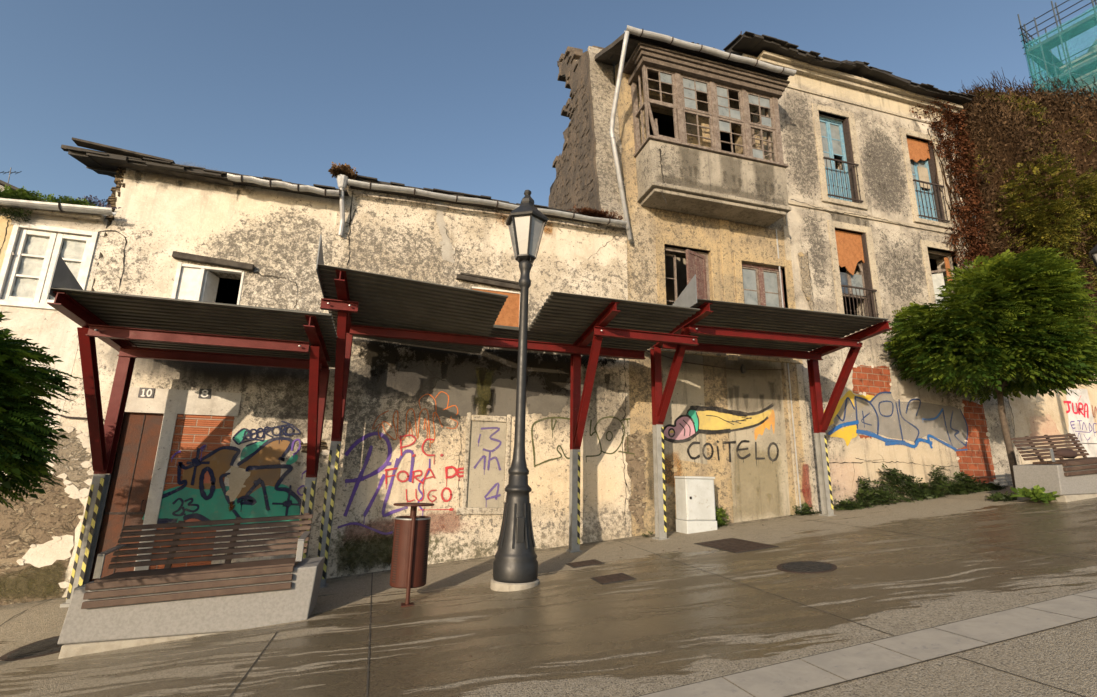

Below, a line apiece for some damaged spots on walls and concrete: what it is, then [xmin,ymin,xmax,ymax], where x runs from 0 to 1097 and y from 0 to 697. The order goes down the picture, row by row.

peeling [0,216,14,272]
leakage [358,339,619,415]
spalling [852,363,892,396]
spalling [956,399,997,484]
peeling [0,426,94,606]